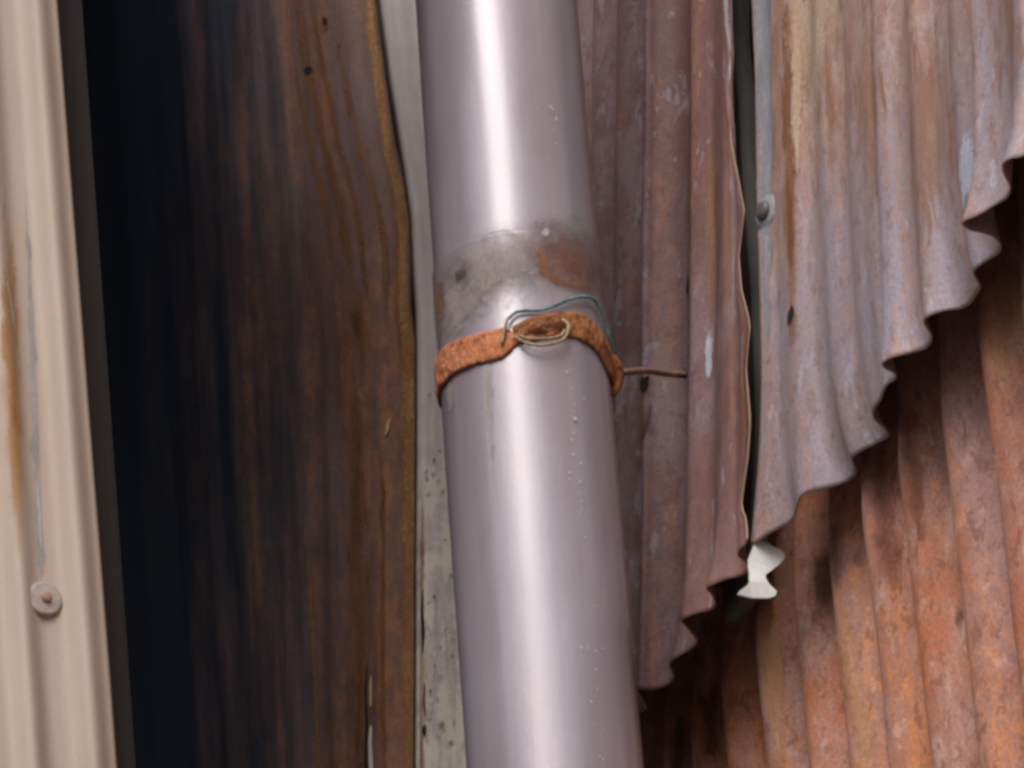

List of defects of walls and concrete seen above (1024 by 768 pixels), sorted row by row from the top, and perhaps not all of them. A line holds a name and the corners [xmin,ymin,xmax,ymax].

rust [780,4,796,286]
rust [849,0,886,203]
rust [760,615,784,763]
rust [835,586,871,768]